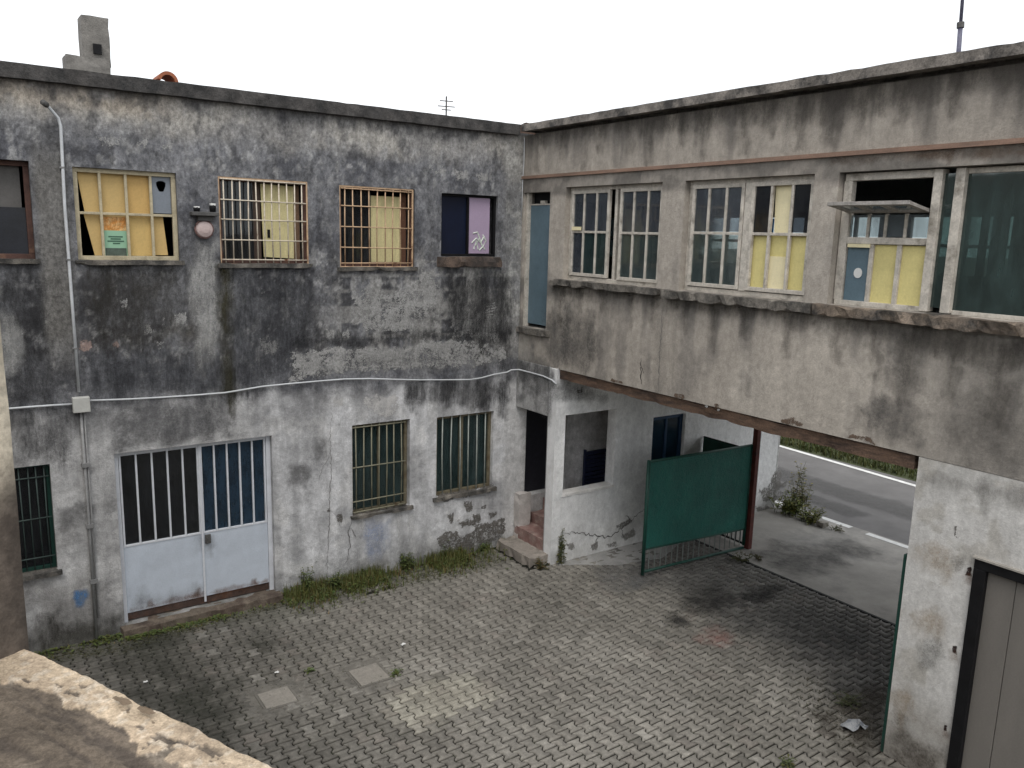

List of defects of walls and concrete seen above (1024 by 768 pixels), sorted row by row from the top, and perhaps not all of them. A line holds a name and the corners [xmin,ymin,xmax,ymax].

water stain [114,242,253,448]
peeling [288,269,507,386]
crack [319,419,356,582]
flaking render [437,483,507,552]
crack [568,509,644,549]